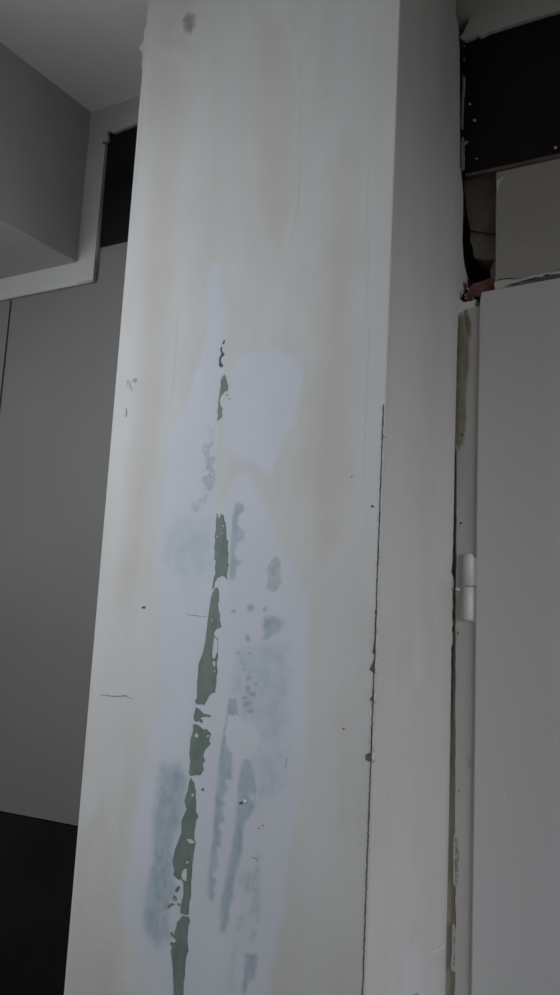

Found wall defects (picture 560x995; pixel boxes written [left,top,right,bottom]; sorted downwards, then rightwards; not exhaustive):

peeling [217,374,230,420]
peeling [167,513,267,995]